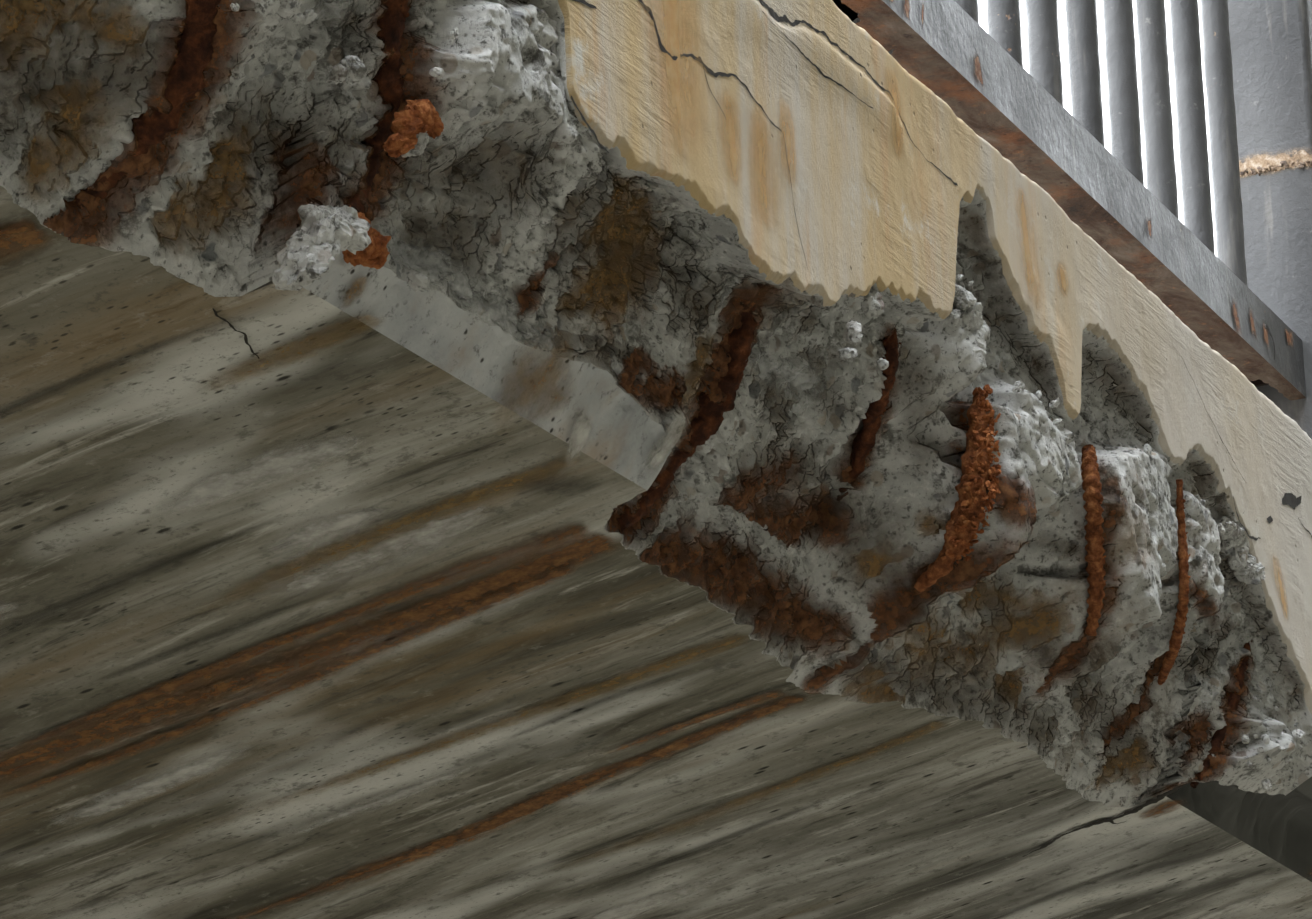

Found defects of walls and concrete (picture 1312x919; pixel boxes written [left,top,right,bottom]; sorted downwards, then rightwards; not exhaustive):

spalling [0,0,222,233]
rust [43,0,250,247]
spalling [99,0,388,297]
rust [260,144,332,240]
rust [343,0,435,221]
crack [573,0,596,9]
crack [571,95,609,153]
crack [638,0,807,266]
crack [759,0,958,186]
spalling [342,0,1312,808]
rust [0,283,1123,919]
crack [1022,787,1181,857]